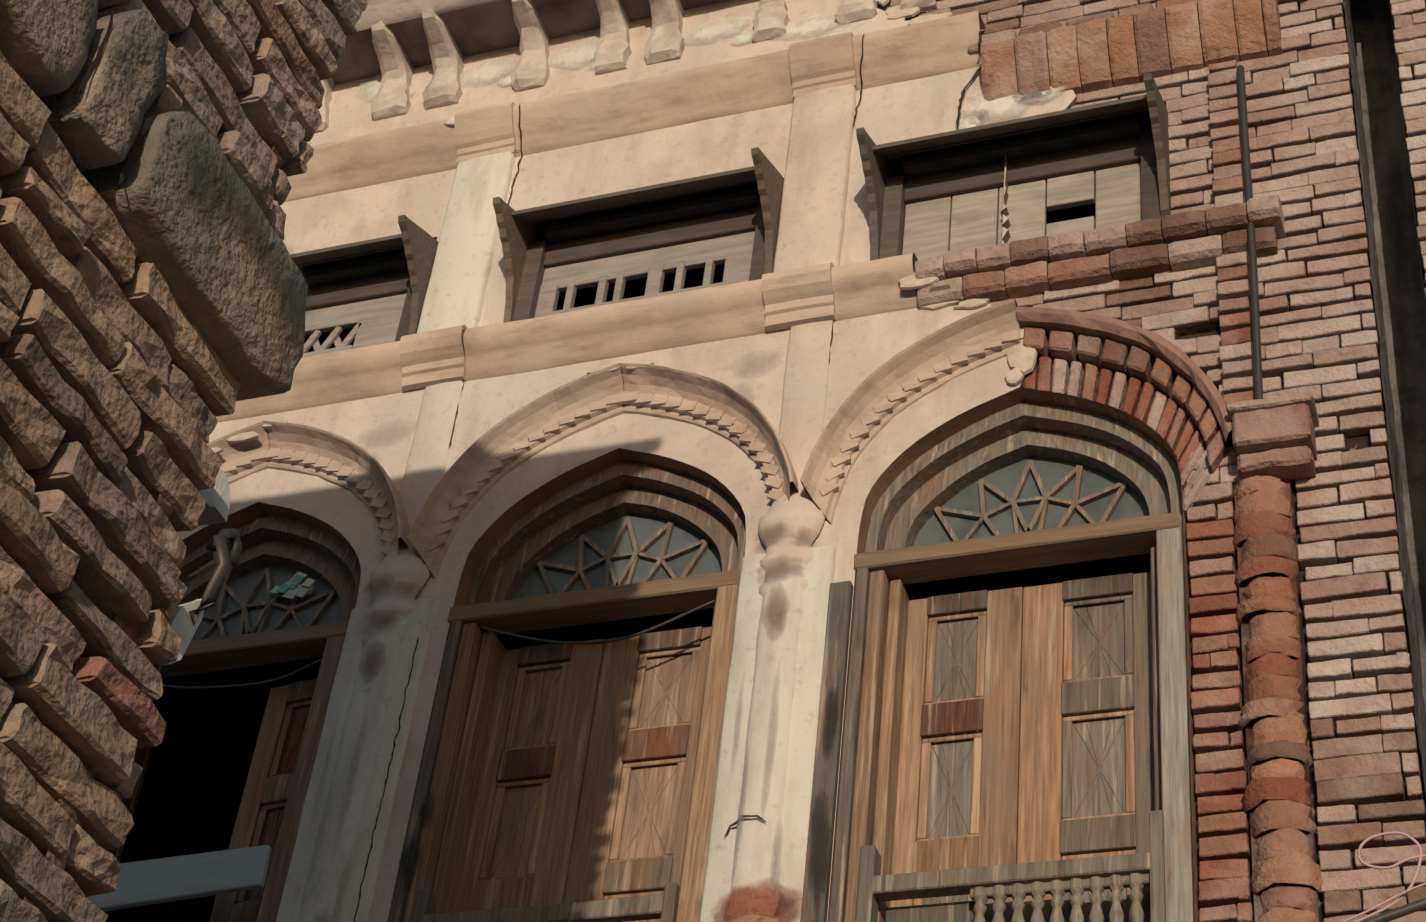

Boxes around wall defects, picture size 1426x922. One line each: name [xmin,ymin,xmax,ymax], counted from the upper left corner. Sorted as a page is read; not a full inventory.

flaking render [876,0,1160,36]
damp [361,74,382,99]
crack [852,33,865,131]
spalling [1000,138,1011,243]
flaking render [1064,62,1215,215]
flaking render [898,265,1224,397]
flaking render [1237,0,1426,922]
flaking render [1184,446,1254,922]
spalling [732,914,781,922]